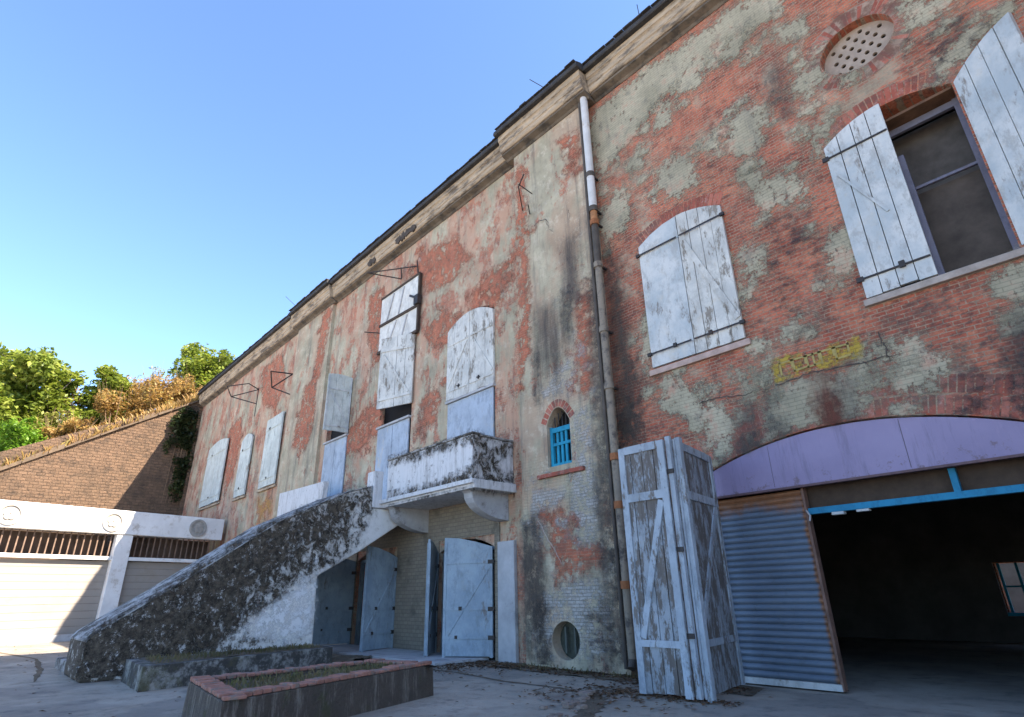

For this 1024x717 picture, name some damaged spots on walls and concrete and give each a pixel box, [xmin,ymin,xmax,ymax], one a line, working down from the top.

flaking render [892,0,1024,89]
flaking render [556,0,868,260]
flaking render [224,417,243,494]
flaking render [292,307,332,458]
flaking render [367,286,385,368]
mould [387,432,515,505]
flaking render [424,165,537,392]
damp [564,242,639,662]
flaking render [626,308,952,467]
crack [699,331,898,406]
mould [72,486,373,680]
damp [521,517,548,664]